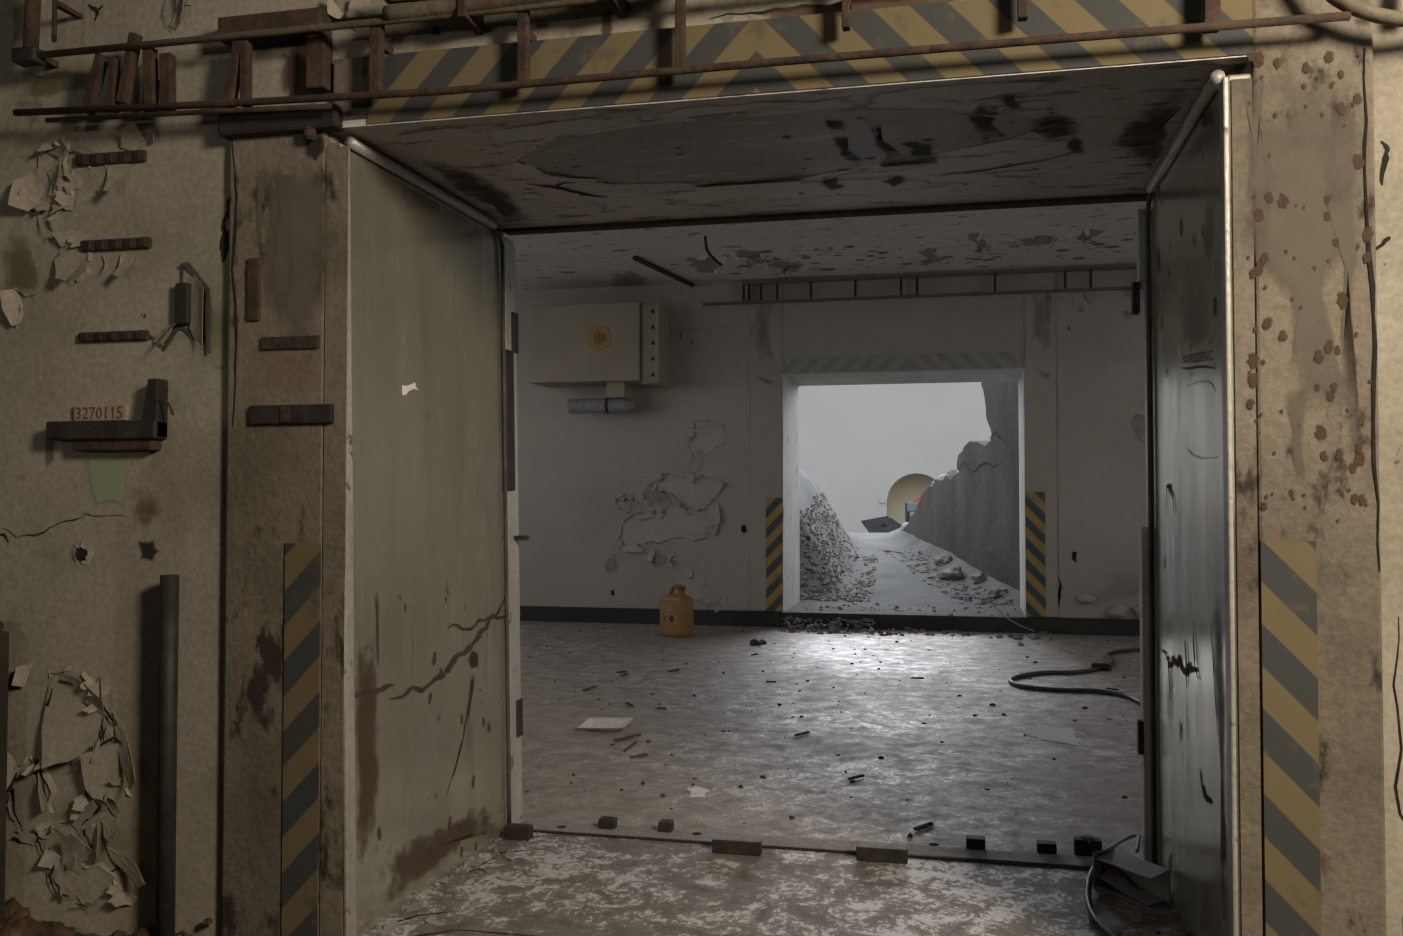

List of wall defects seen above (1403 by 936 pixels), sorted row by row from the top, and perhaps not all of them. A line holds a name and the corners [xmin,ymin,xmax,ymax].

peeling [8,122,154,286]
crack [0,513,123,543]
peeling [646,549,730,613]
peeling [6,664,145,910]